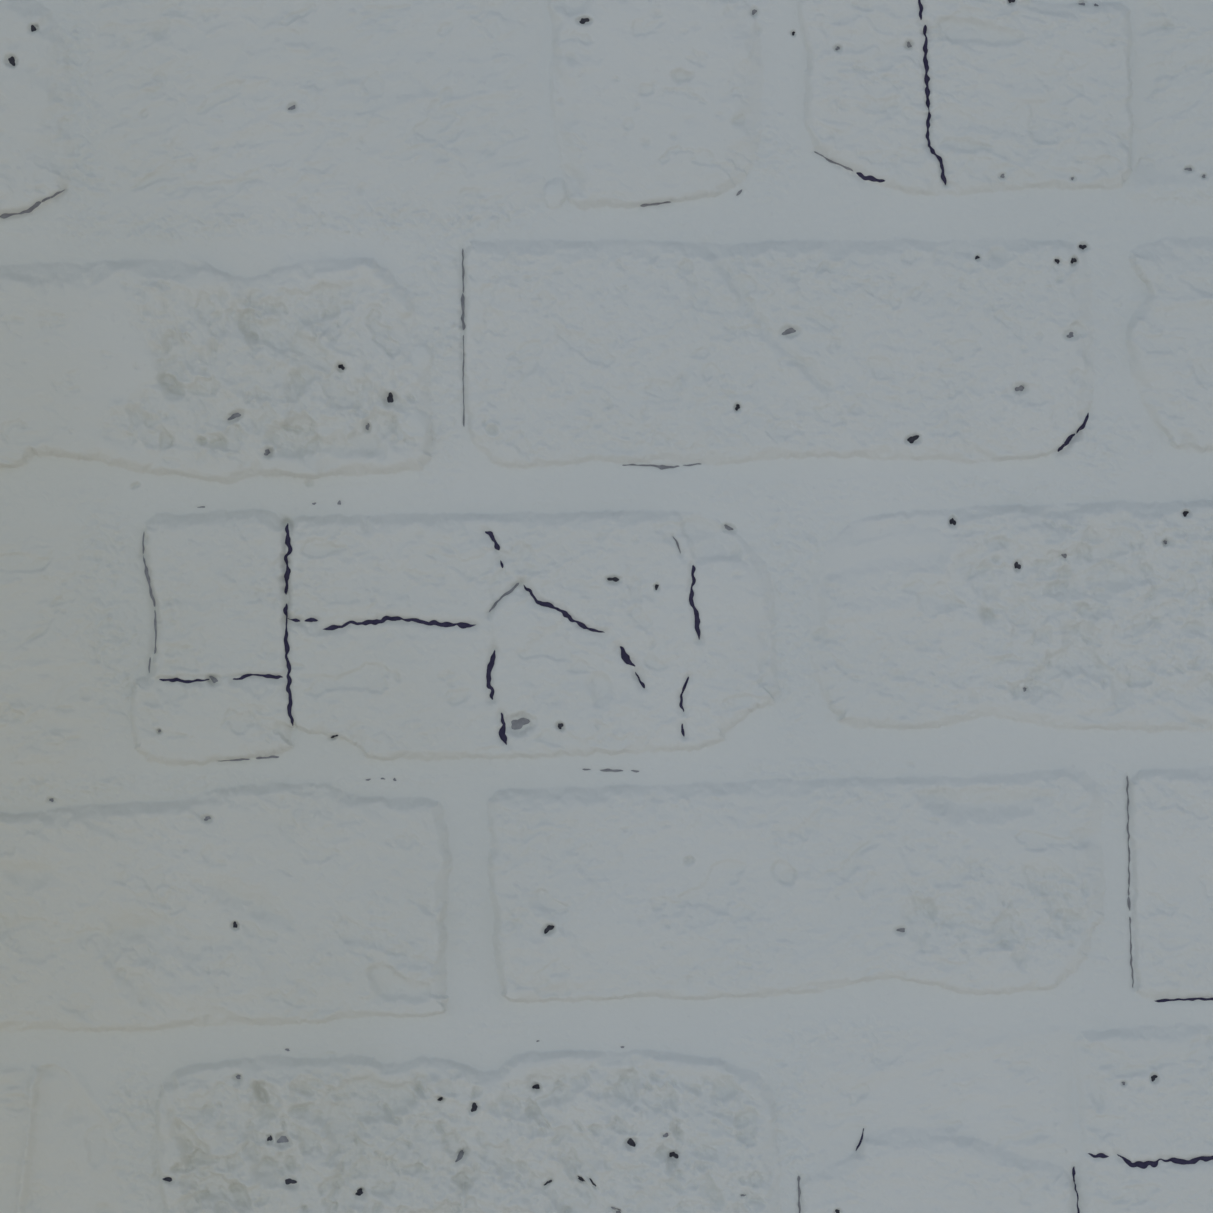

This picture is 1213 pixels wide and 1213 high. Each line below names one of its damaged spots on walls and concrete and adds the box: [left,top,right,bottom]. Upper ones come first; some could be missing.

crack [918,0,947,185]
crack [159,524,645,726]
crack [673,537,700,640]
crack [486,650,507,745]
crack [679,677,689,736]
crack [1072,1153,1213,1213]